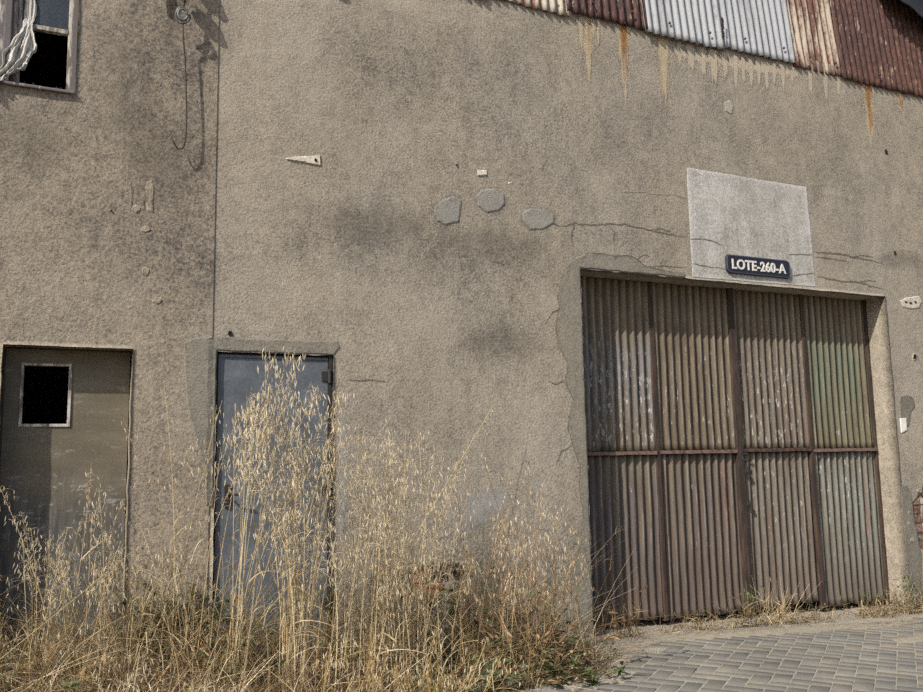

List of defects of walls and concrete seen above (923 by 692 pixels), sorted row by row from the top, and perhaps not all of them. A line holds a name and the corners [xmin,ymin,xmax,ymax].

corrosion [578,14,600,83]
corrosion [617,22,630,104]
corrosion [656,34,670,103]
corrosion [861,83,875,148]
crack [789,251,883,289]
flaking render [908,488,923,550]